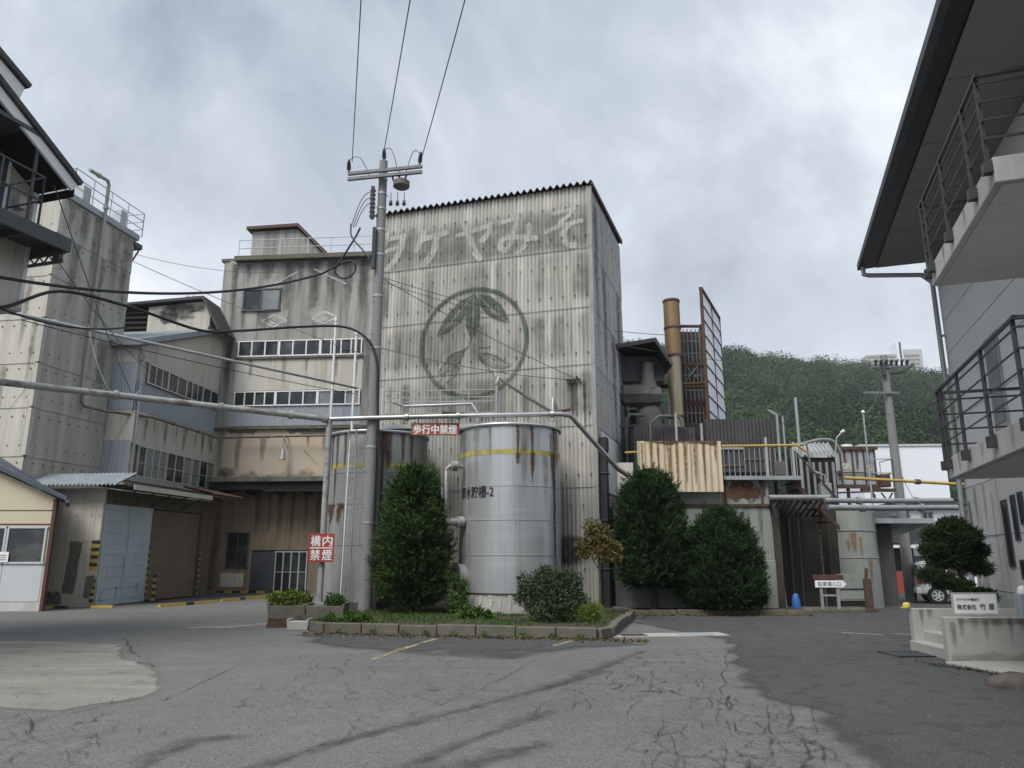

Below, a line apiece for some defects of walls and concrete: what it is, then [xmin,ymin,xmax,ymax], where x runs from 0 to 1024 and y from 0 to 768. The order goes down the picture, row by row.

leakage [570,374,586,407]
rust [381,432,414,466]
rust [516,425,535,475]
rust [641,441,717,480]
rust [328,433,347,545]
rust [723,480,766,502]
crack [535,650,849,768]